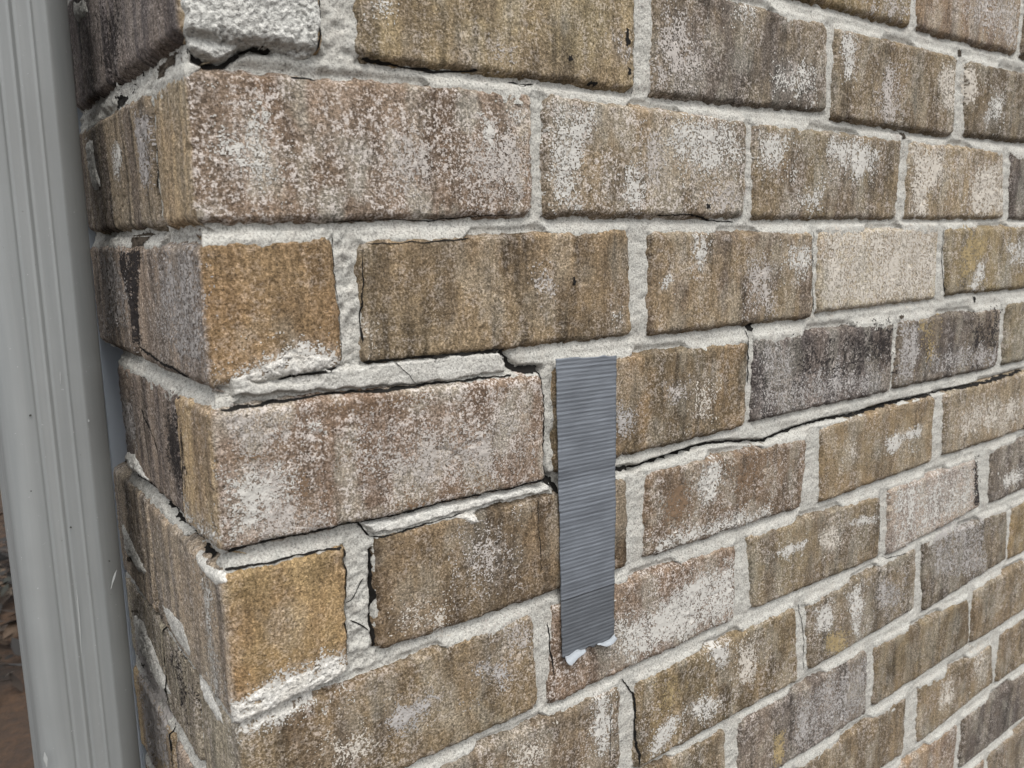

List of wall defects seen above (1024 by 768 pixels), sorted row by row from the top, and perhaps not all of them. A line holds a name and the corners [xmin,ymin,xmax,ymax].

crack [138,215,558,647]
crack [615,370,1021,471]
crack [610,679,641,765]